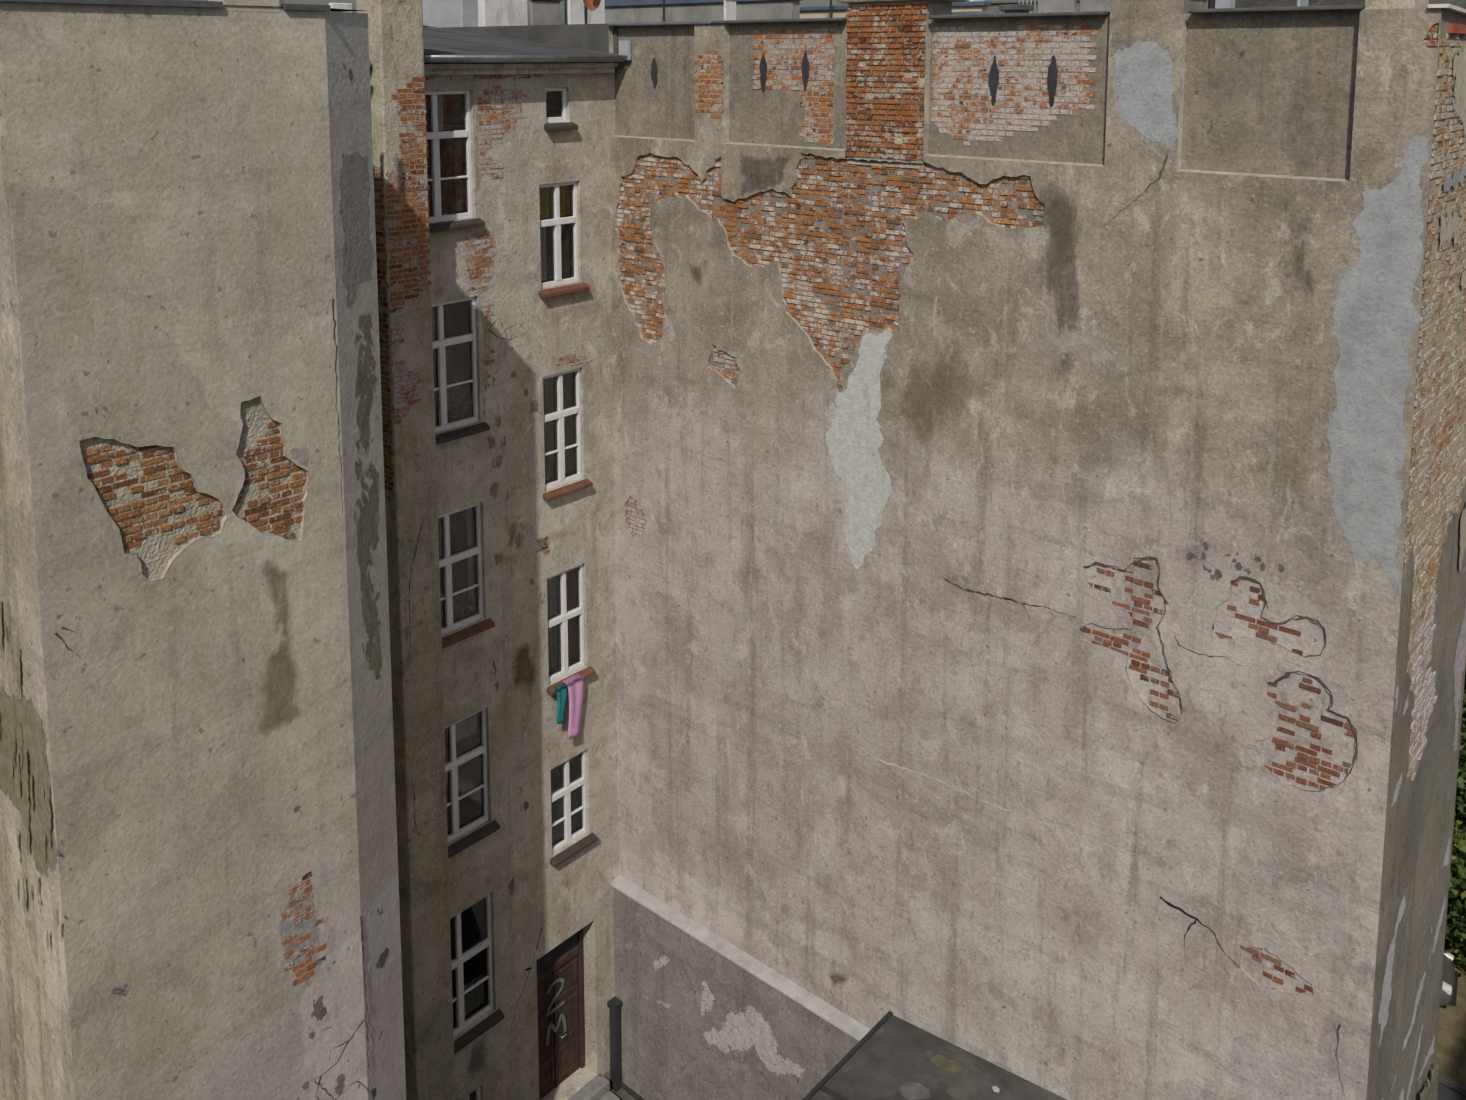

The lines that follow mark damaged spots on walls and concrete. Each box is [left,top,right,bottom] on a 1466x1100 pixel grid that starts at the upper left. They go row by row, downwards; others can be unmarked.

flaking render [931,24,1097,146]
flaking render [615,28,1045,407]
crack [1102,155,1168,227]
flaking render [352,74,543,681]
flaking render [1403,23,1466,641]
flaking render [79,396,310,581]
crack [945,578,1077,621]
flaking render [1079,556,1185,724]
flaking render [1187,541,1358,791]
flaking render [279,871,329,1039]
crack [309,916,371,1100]
peeling [1378,895,1446,1100]